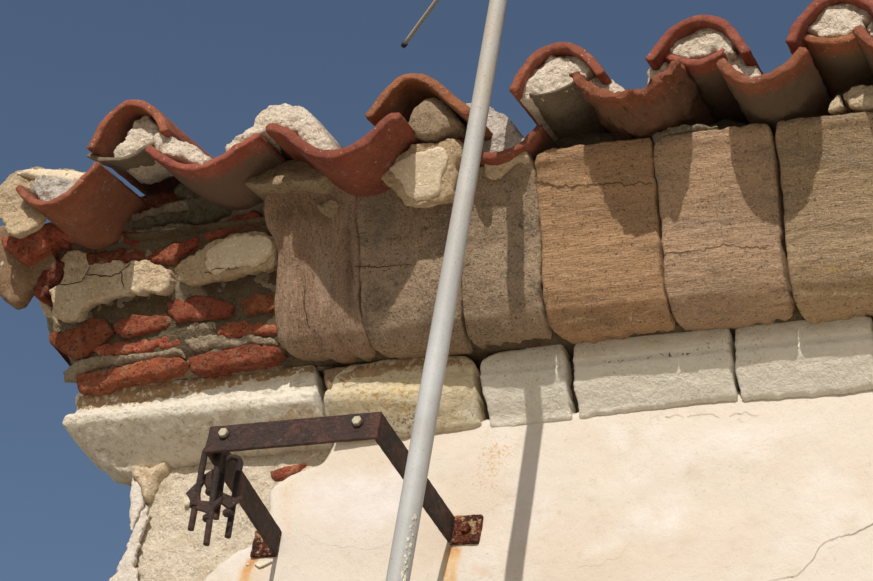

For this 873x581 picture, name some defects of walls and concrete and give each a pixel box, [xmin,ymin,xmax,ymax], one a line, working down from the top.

crack [535,180,653,188]
crack [59,262,131,286]
crack [662,243,767,257]
flaking render [241,449,331,511]
flaking render [109,462,257,581]
corrosion [232,477,296,581]
corrosion [436,544,467,581]
crack [772,523,873,580]